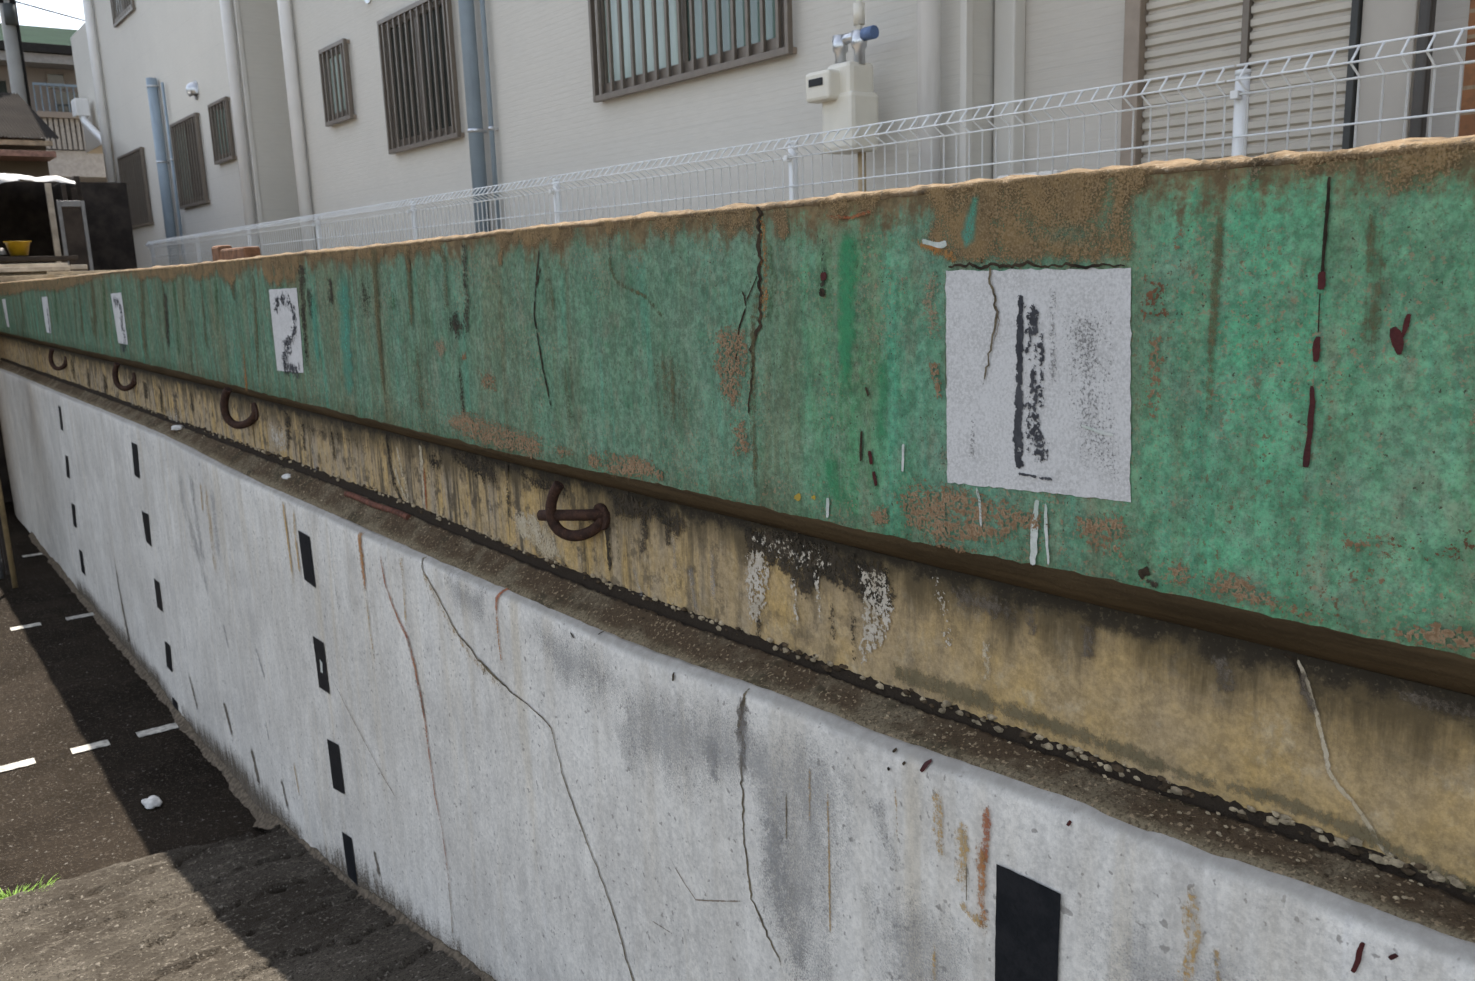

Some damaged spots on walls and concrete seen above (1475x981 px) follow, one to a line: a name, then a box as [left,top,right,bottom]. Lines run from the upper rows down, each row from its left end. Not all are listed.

crack [735,206,776,486]
peeling [899,165,1156,338]
leakage [744,525,896,663]
peeling [868,476,1055,560]
peeling [1138,561,1323,622]
corrosion [357,532,453,934]
crack [421,555,634,981]
leakage [622,702,834,980]
crack [676,688,781,964]
corrosion [932,794,991,927]
leakage [895,642,1475,892]
crack [1284,654,1399,860]